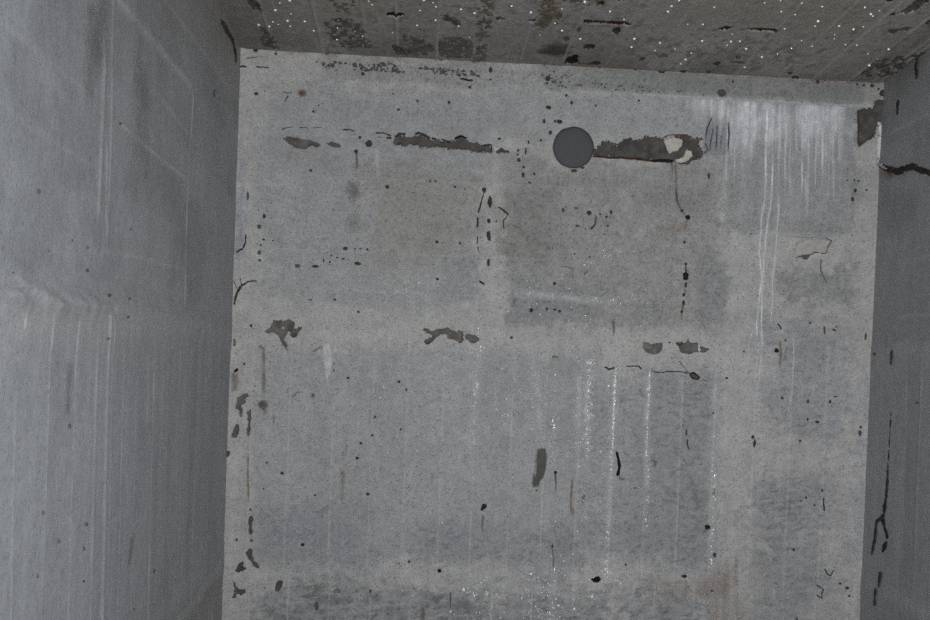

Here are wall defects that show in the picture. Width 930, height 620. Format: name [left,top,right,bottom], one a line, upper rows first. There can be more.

spalling [890,0,929,15]
peeling [324,0,372,48]
peeling [253,27,280,55]
spalling [856,51,925,158]
spalling [358,94,573,184]
spalling [592,134,705,165]
leakage [698,99,842,345]
spalling [265,319,302,350]
spalling [423,328,480,345]